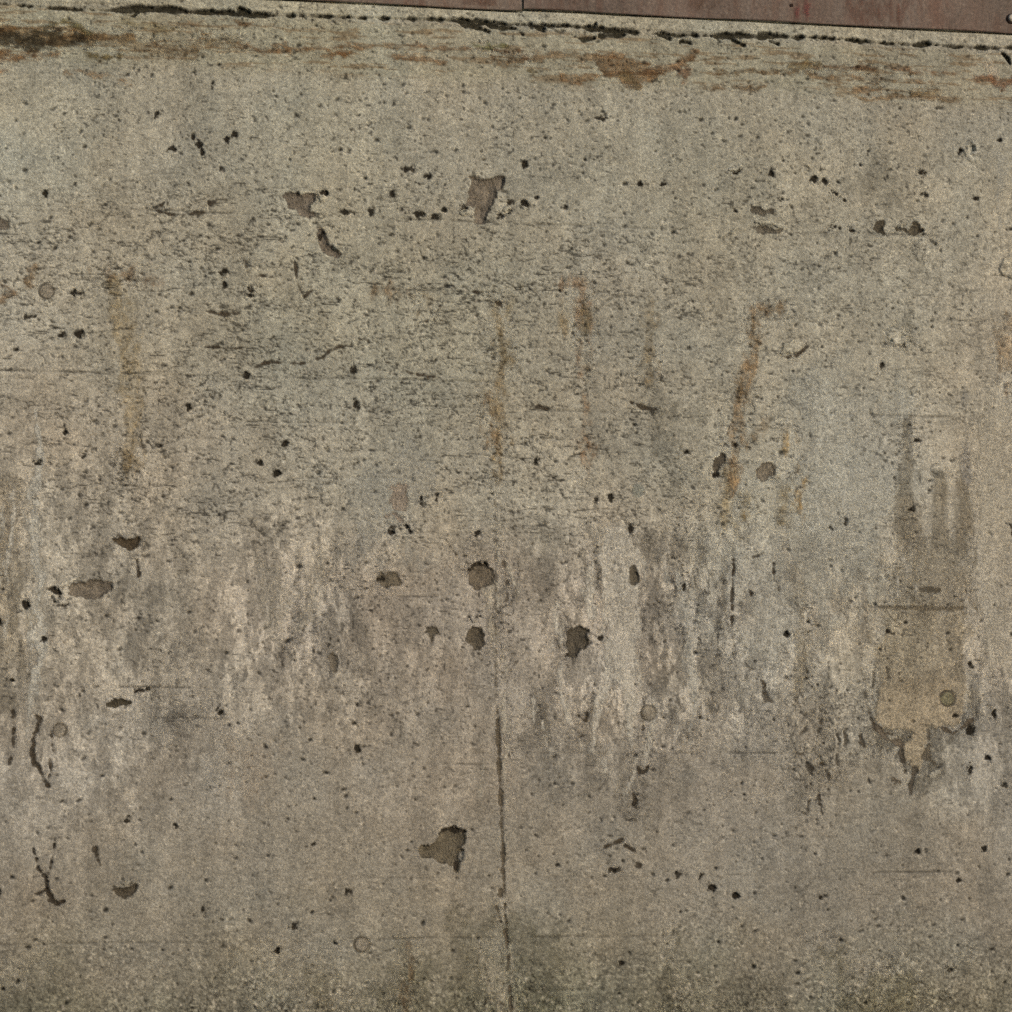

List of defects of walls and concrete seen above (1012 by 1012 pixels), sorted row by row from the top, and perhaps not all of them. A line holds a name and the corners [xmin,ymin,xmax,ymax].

corrosion [0,18,143,61]
corrosion [229,42,364,58]
crack [3,4,1012,65]
corrosion [392,42,700,90]
corrosion [721,59,957,102]
spalling [459,176,514,224]
leakage [699,366,1012,703]
spalling [565,625,603,657]
crack [8,710,54,788]
peeling [781,668,980,814]
spalling [418,826,471,873]
crack [33,843,66,906]